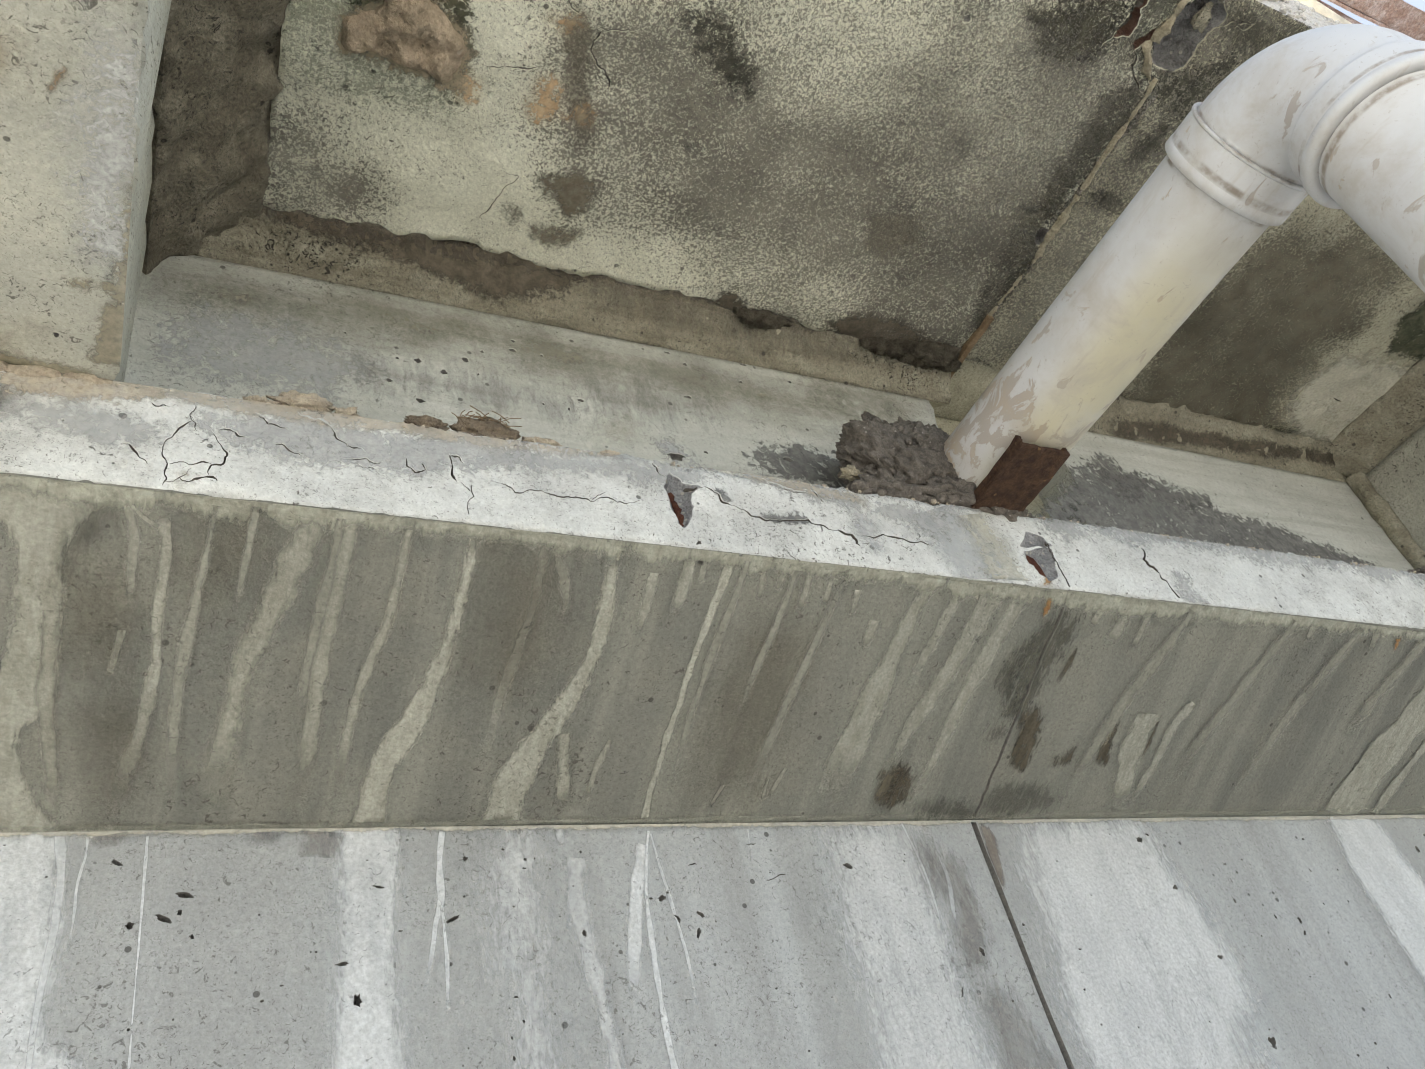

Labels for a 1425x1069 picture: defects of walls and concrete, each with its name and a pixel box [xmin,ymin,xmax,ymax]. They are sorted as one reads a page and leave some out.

spalling [1114,0,1227,81]
water stain [0,54,165,404]
mould [261,56,410,227]
water stain [493,0,1312,369]
water stain [338,302,611,370]
water stain [1120,202,1419,443]
water stain [189,412,713,484]
crack [123,402,929,546]
spalling [664,473,700,528]
spalling [1020,532,1058,581]
crack [1141,548,1180,598]
water stain [0,444,1425,1069]